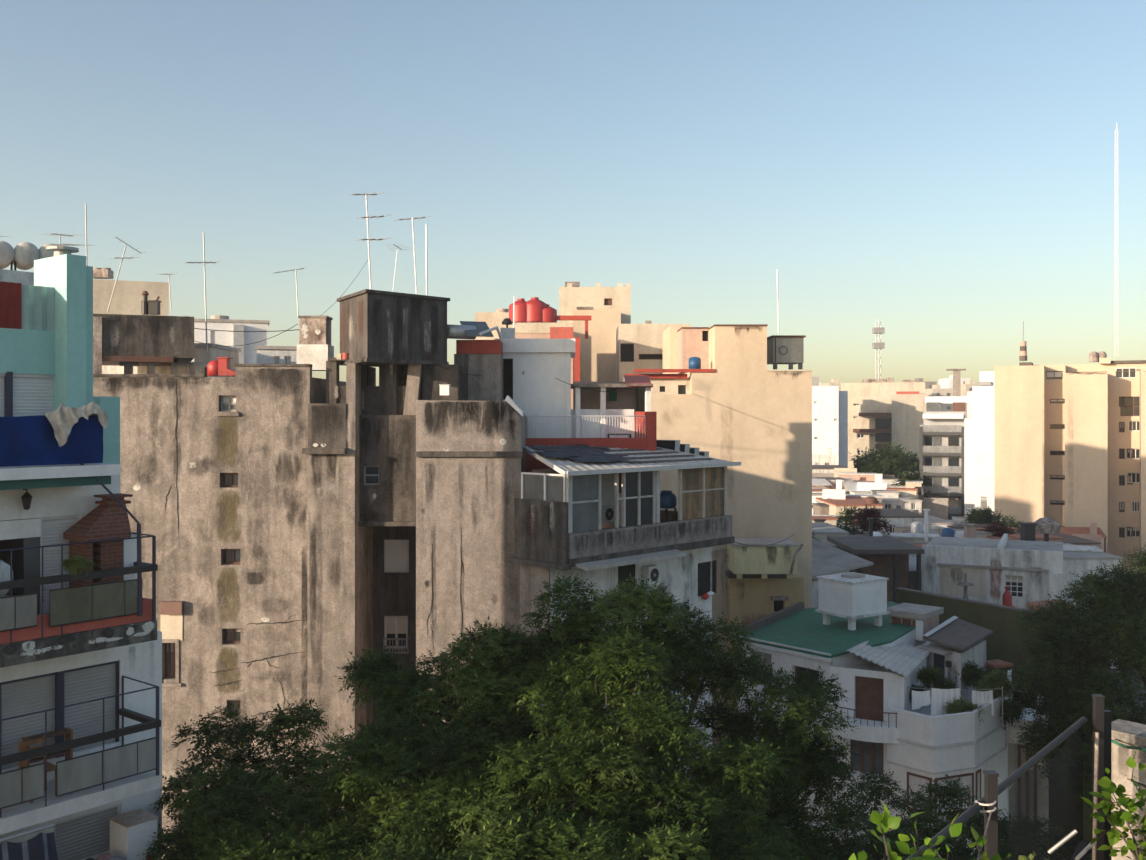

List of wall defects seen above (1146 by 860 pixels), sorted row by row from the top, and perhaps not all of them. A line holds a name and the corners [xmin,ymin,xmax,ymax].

damp [374,299,438,374]
damp [425,401,515,436]
crack [165,380,179,538]
damp [209,494,248,541]
damp [218,568,263,619]
peeling [2,621,154,656]